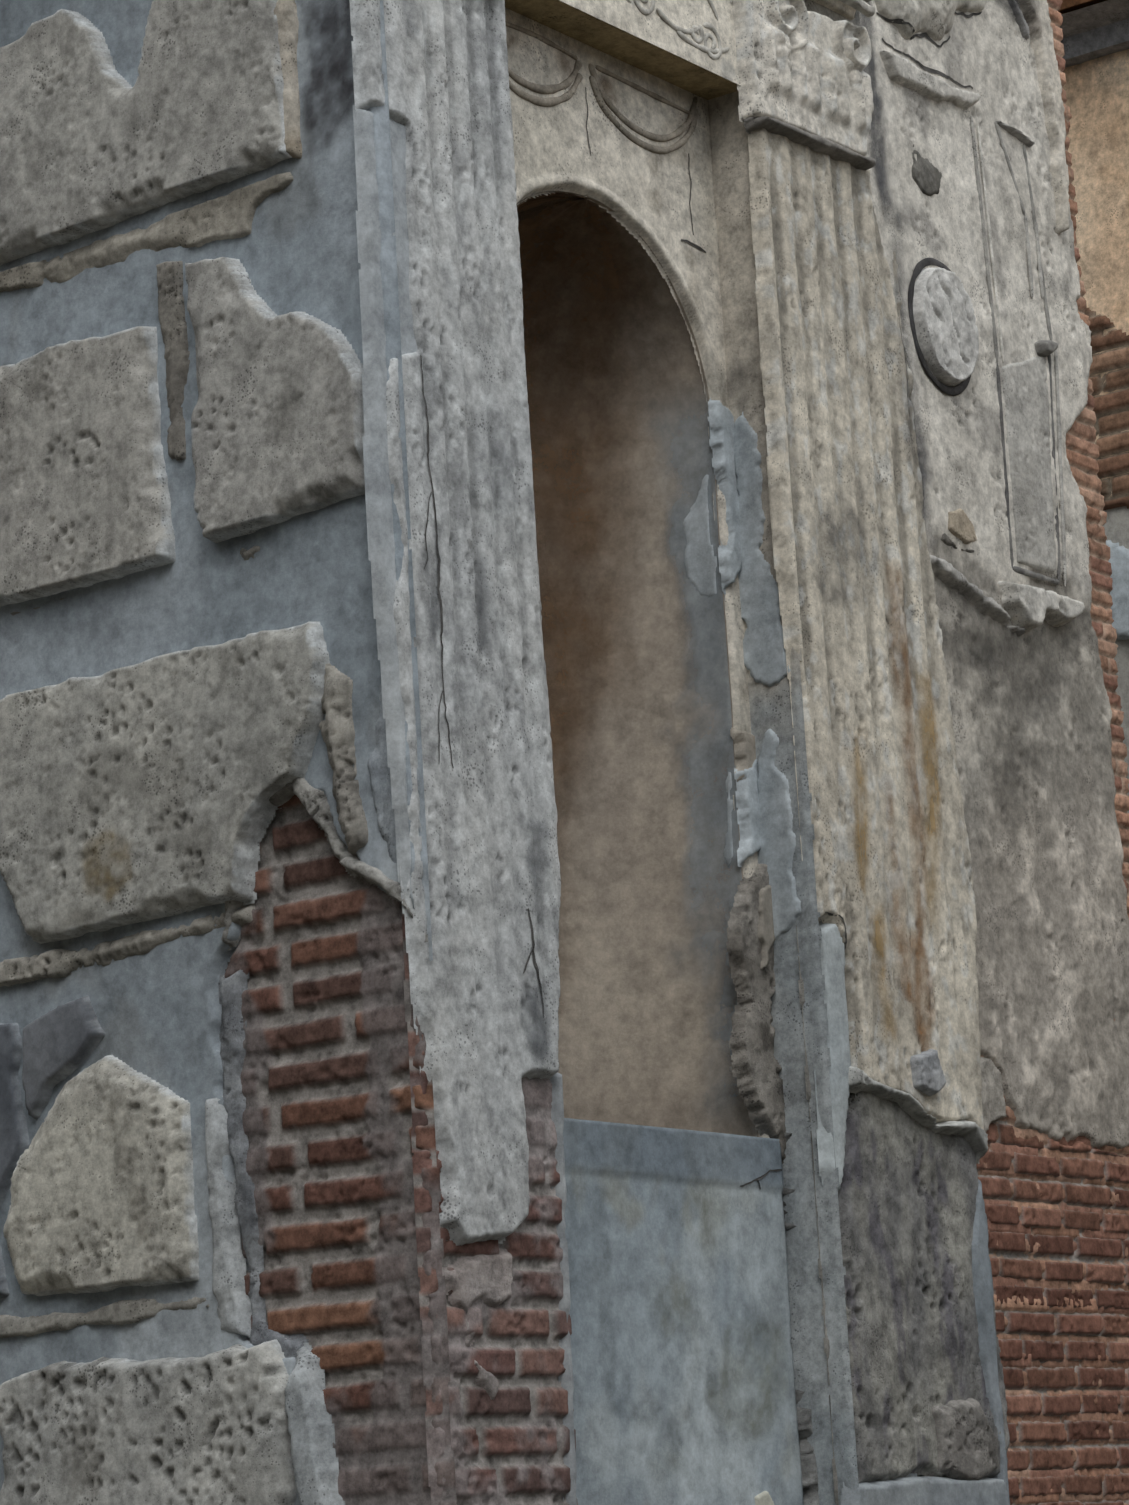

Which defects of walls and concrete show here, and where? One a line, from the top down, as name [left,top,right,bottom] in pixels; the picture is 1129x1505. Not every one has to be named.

crack [421,356,454,768]
spalling [218,777,578,1505]
crack [523,908,544,1018]
spalling [838,1049,1129,1505]